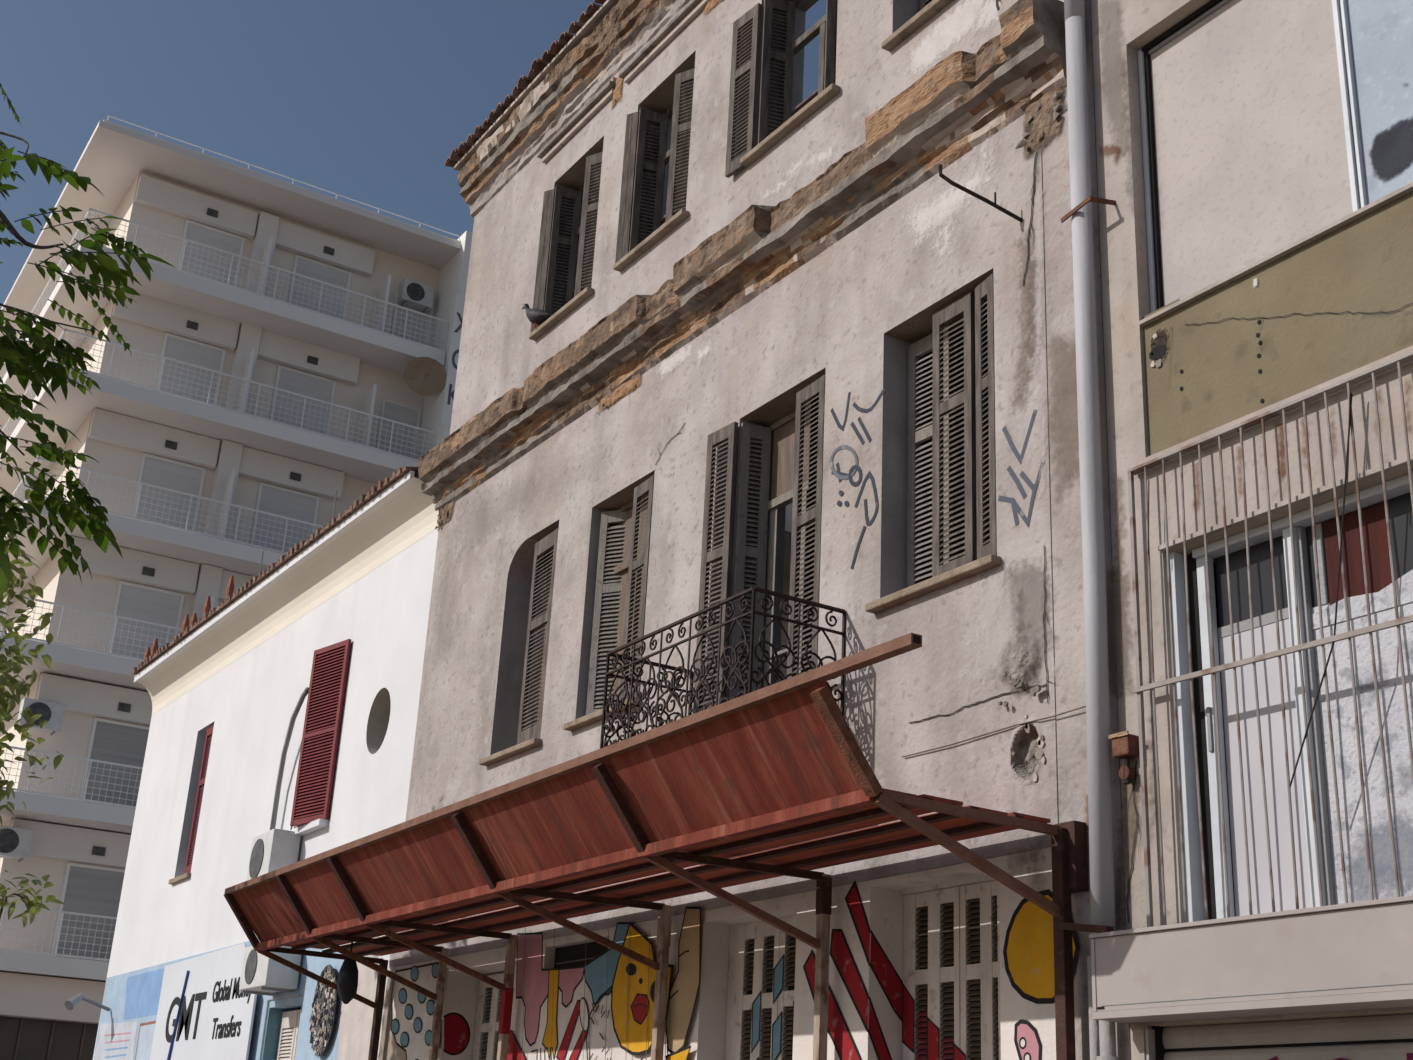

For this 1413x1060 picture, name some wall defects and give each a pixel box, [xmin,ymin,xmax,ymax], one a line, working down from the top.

peeling [907,0,1002,75]
spalling [611,76,623,108]
spalling [1015,85,1063,159]
peeling [762,144,836,199]
spalling [596,373,641,414]
peeling [658,340,712,378]
crack [1166,302,1413,407]
crack [909,545,1056,723]
spalling [1007,709,1049,793]